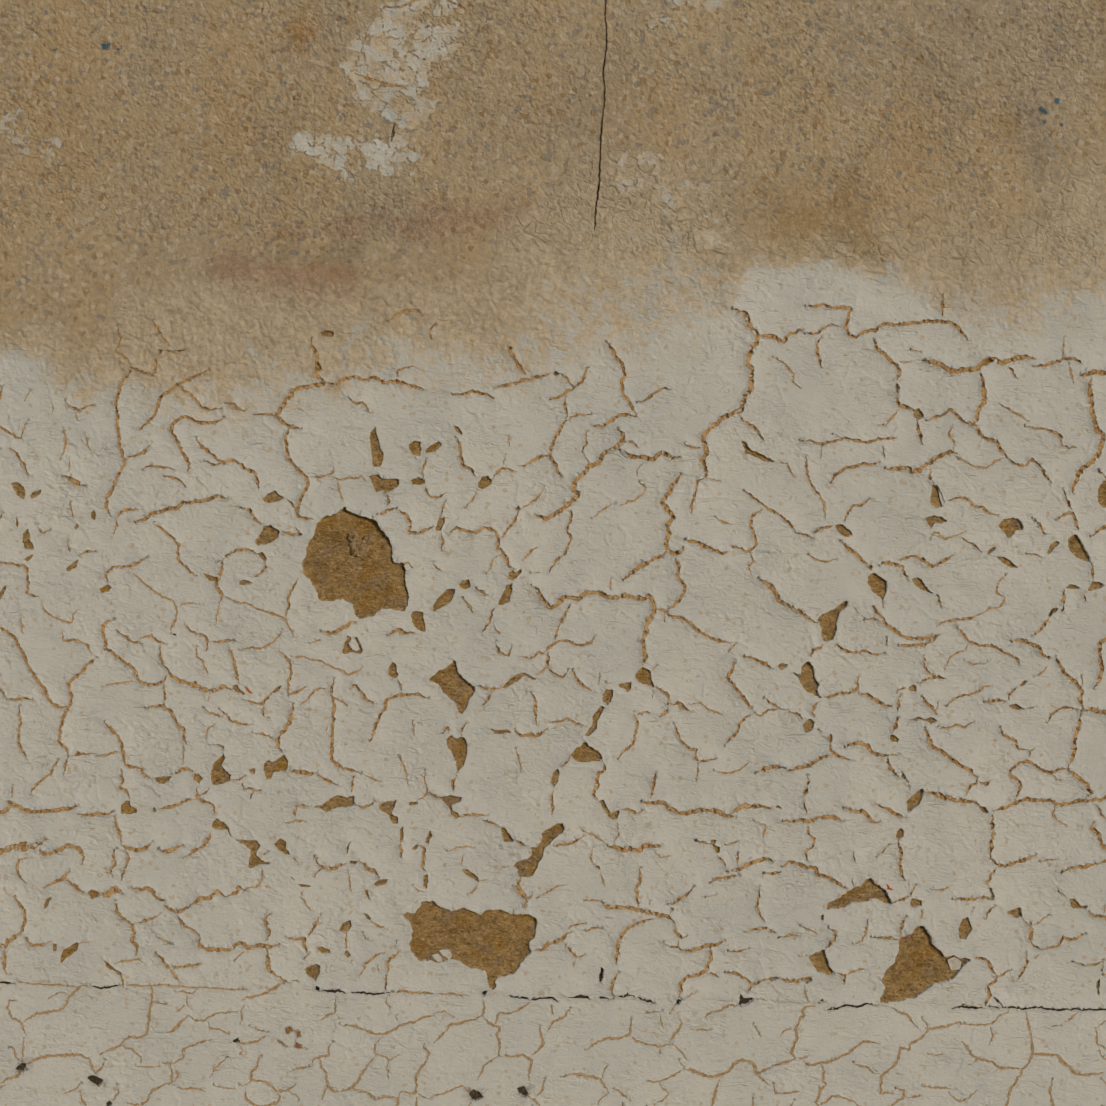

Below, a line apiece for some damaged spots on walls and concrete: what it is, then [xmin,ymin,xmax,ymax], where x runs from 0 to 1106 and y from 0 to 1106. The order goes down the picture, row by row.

flaking render [0,0,1106,268]
crack [592,0,610,233]
peeling [432,949,452,962]
peeling [947,954,963,970]